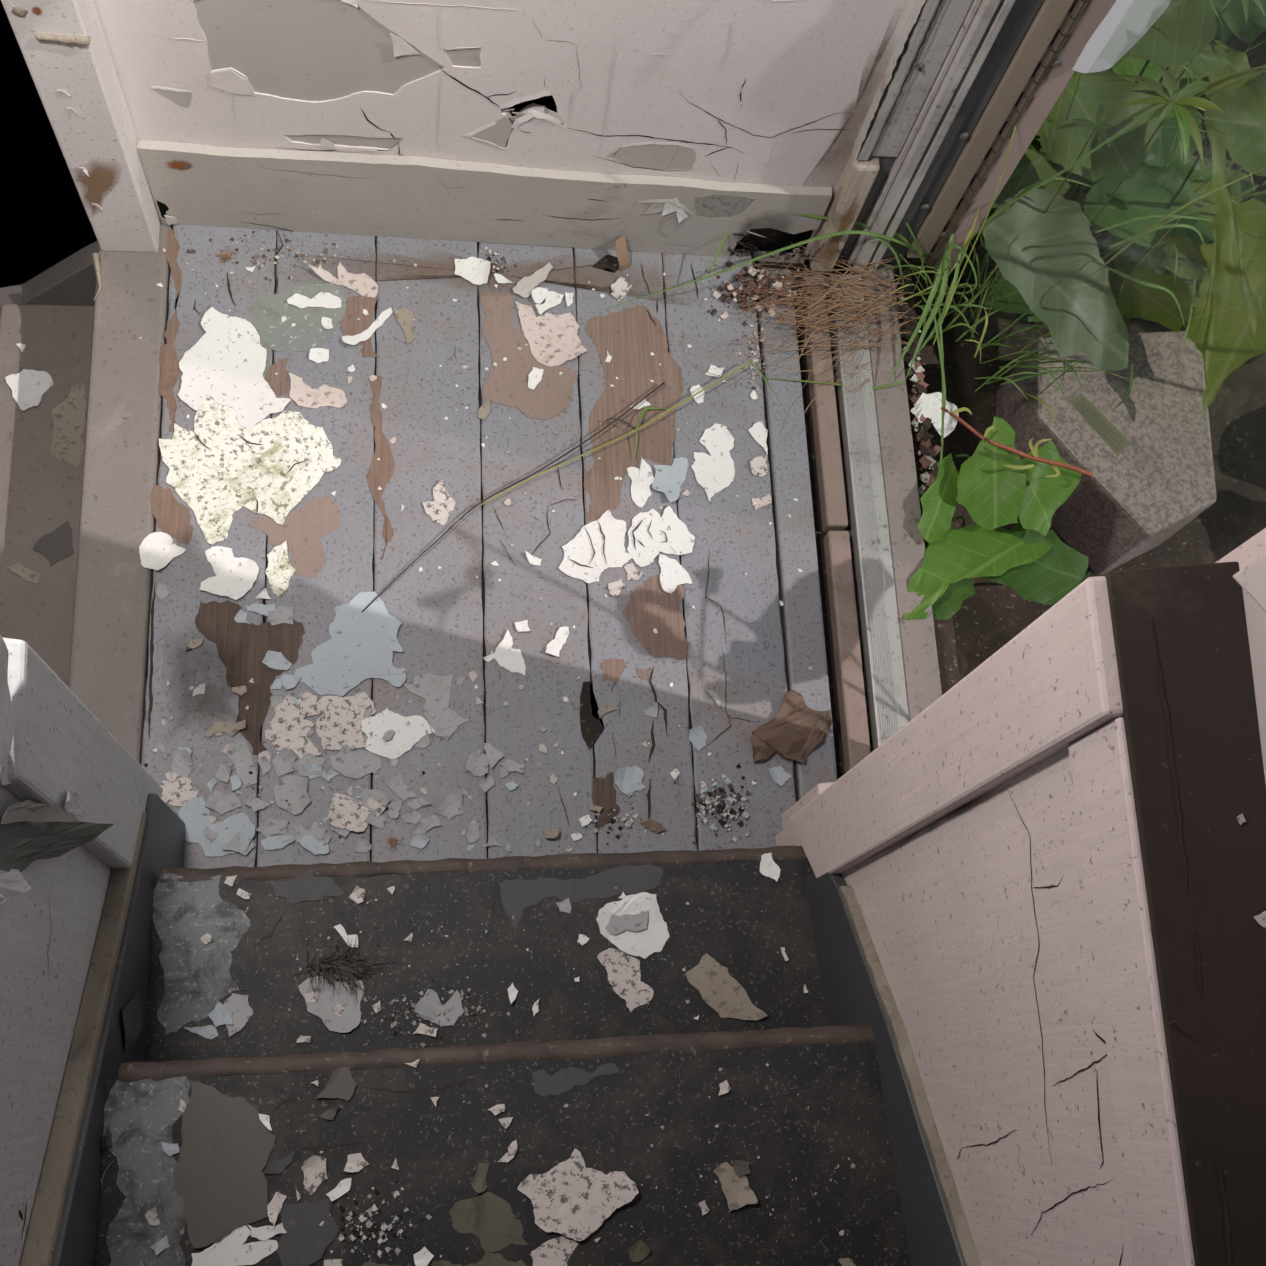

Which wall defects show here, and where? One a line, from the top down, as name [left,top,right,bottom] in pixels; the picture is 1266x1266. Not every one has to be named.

crack [258,109,404,179]
crack [440,47,545,107]
crack [570,78,850,184]
peeling [454,257,632,390]
peeling [159,285,356,626]
peeling [558,365,772,597]
peeling [153,591,564,857]
crack [647,667,679,819]
peeling [596,887,670,1013]
crack [1005,786,1113,1235]
peeling [518,1149,639,1266]
crack [957,1130,1016,1159]